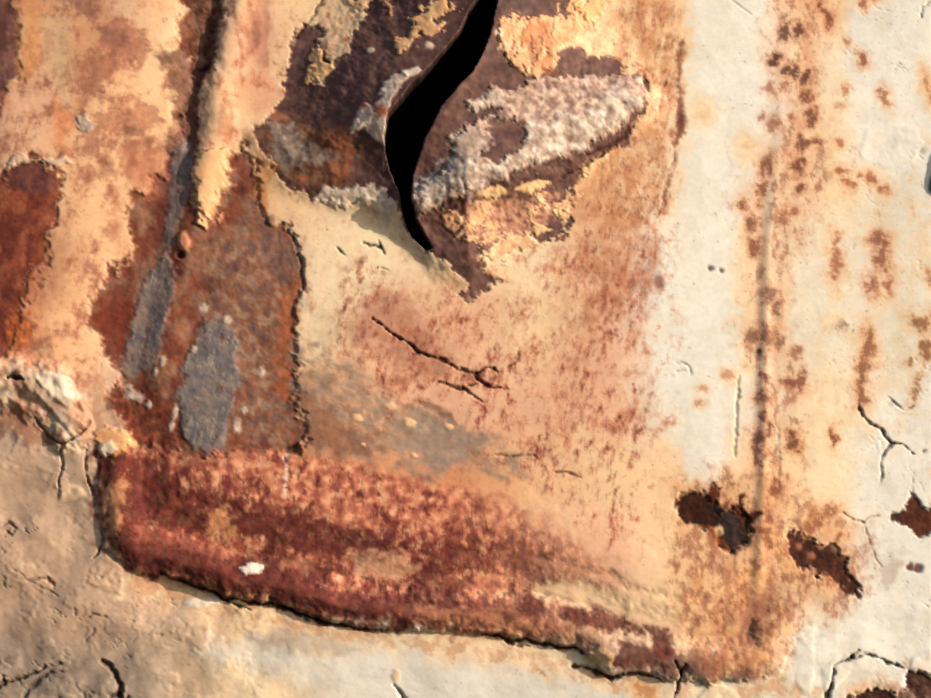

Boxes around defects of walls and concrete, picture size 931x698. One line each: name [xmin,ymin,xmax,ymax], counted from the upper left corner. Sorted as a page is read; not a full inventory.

rust [9,0,174,206]
rust [51,0,724,698]
crack [370,315,520,403]
rust [649,0,906,690]
rust [897,262,931,415]
spalling [670,479,766,558]
crack [11,568,59,597]
peeling [87,552,124,596]
peeling [182,596,223,609]
crack [0,611,131,698]
peeling [580,645,617,670]
crack [822,648,904,698]